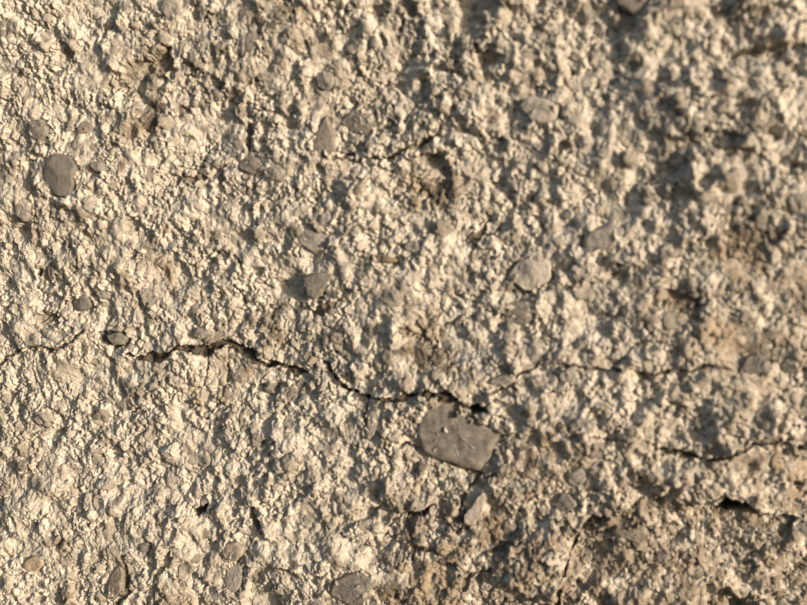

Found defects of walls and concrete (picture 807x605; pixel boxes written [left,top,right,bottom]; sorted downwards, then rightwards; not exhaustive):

crack [0,330,83,366]
crack [126,339,733,450]
crack [654,440,785,462]
crack [554,514,604,605]